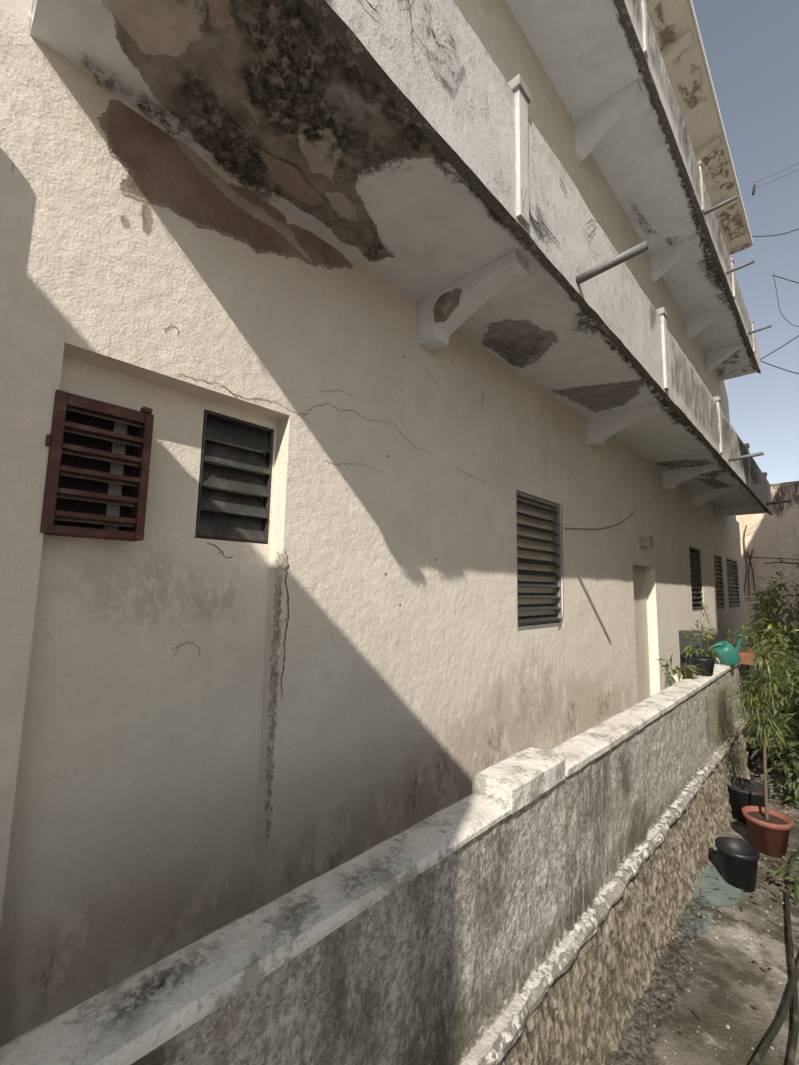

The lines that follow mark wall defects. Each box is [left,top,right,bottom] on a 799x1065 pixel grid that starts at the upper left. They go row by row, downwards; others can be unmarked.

peeling [419,0,465,88]
leakage [138,74,282,197]
peeling [98,0,448,269]
leakage [230,0,528,250]
peeling [433,288,462,323]
crack [177,374,432,454]
leakage [756,484,799,513]
leakage [609,898,707,1065]